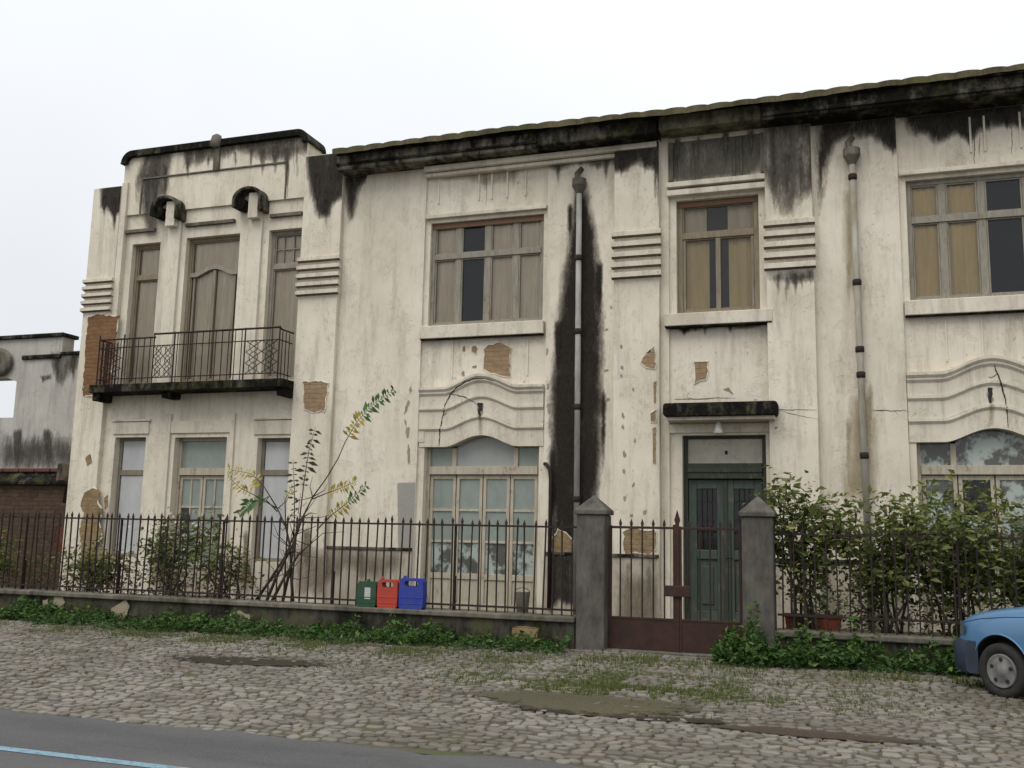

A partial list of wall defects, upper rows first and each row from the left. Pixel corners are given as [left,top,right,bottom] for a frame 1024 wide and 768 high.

water stain [101,186,121,225]
water stain [184,137,367,217]
water stain [673,105,1024,209]
spalling [82,314,121,397]
spalling [302,380,329,413]
crack [439,378,493,443]
spalling [461,342,512,378]
water stain [550,195,606,538]
spalling [694,361,709,384]
crack [991,365,1008,423]
water stain [3,430,71,468]
spalling [79,487,108,579]